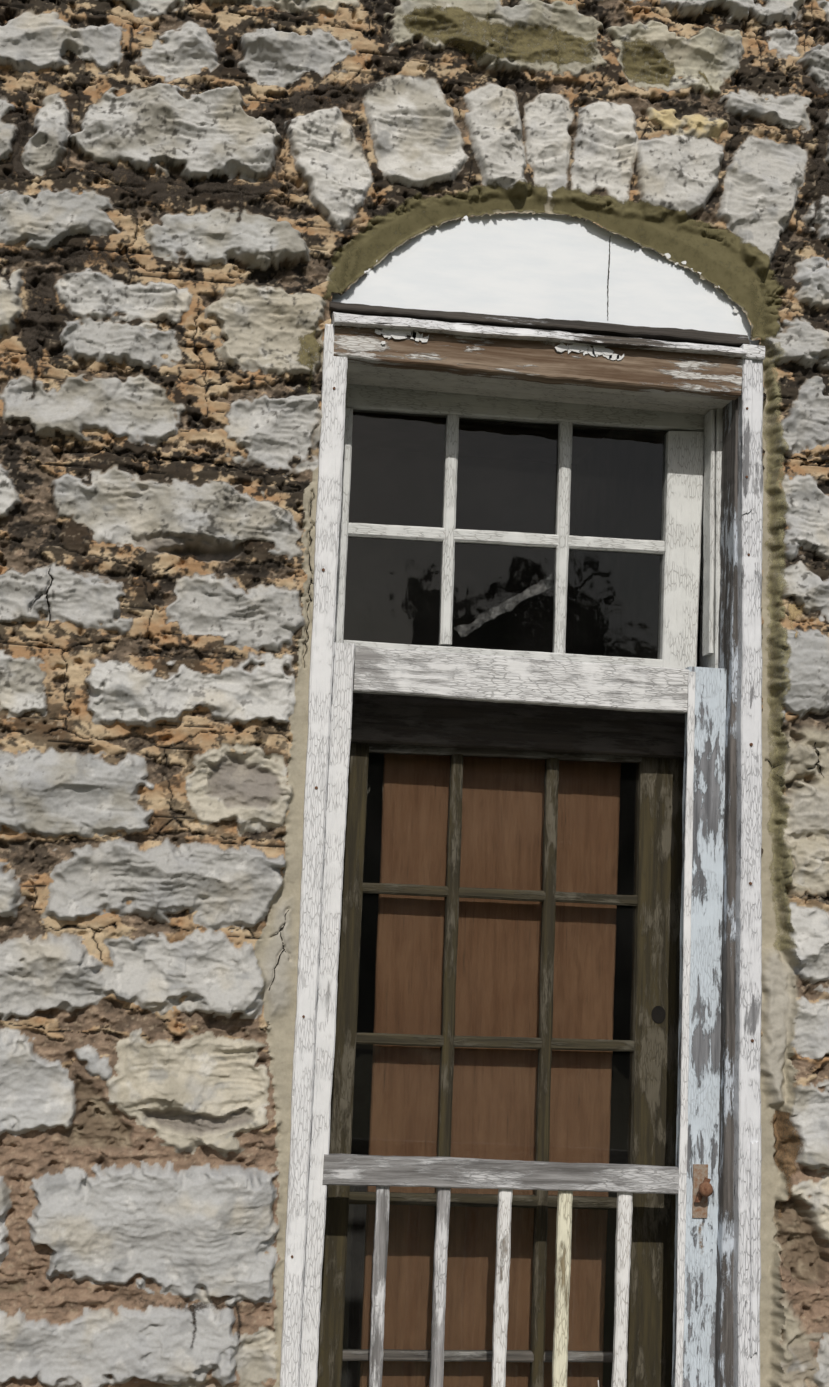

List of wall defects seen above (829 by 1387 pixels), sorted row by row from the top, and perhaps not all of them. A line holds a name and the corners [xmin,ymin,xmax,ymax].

peeling [375,328,429,345]
peeling [555,342,624,360]